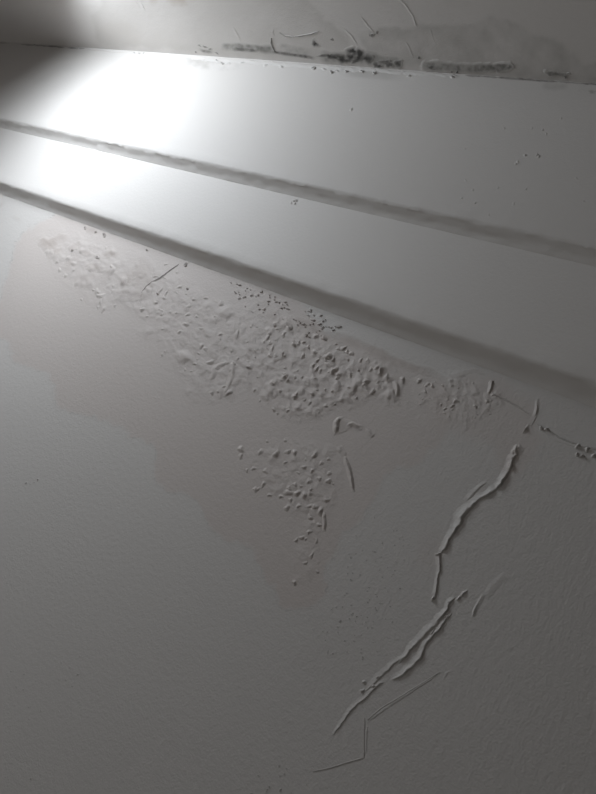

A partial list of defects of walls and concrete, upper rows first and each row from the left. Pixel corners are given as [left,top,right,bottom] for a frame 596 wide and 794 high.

leakage [88,0,596,96]
leakage [0,213,550,612]
crack [313,380,596,772]